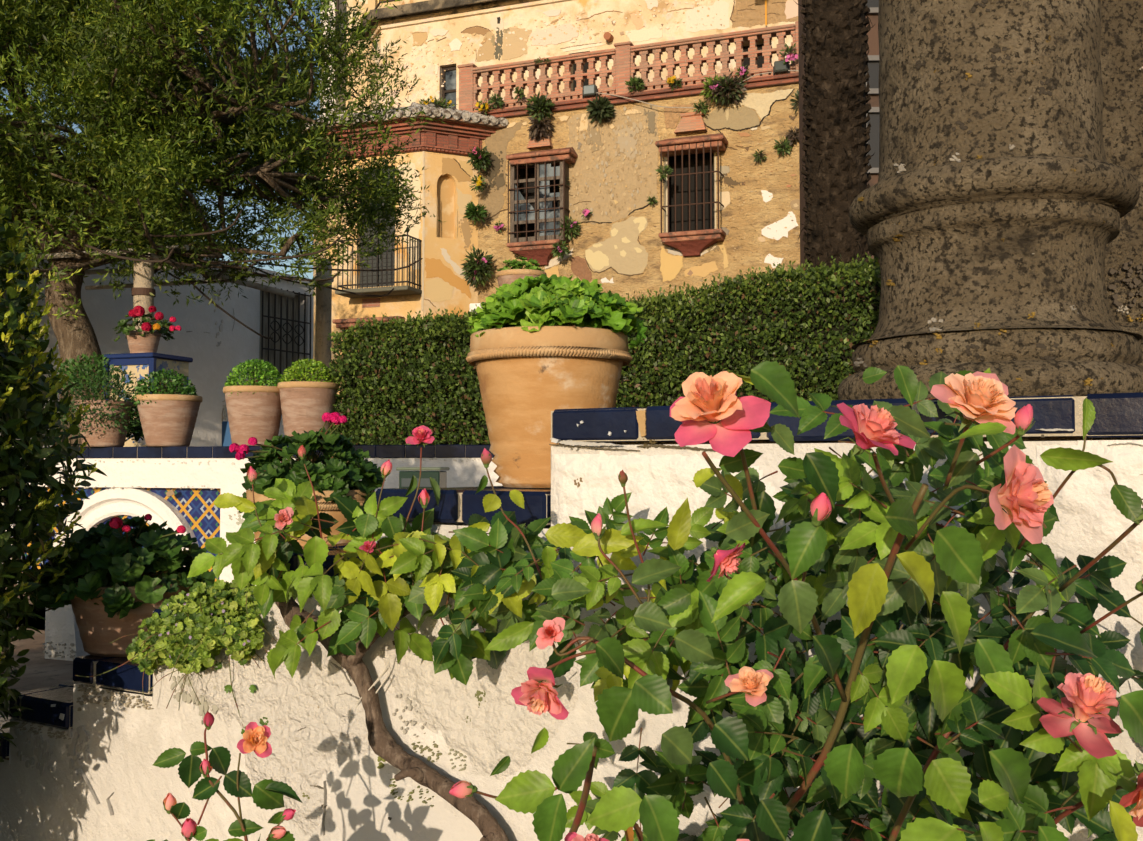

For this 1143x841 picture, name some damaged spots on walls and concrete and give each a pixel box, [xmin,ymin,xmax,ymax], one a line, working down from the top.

flaking render [430,16,504,52]
peeling [530,9,605,52]
peeling [611,0,663,42]
crack [705,89,794,150]
flaking render [545,216,648,288]
peeling [758,203,799,268]